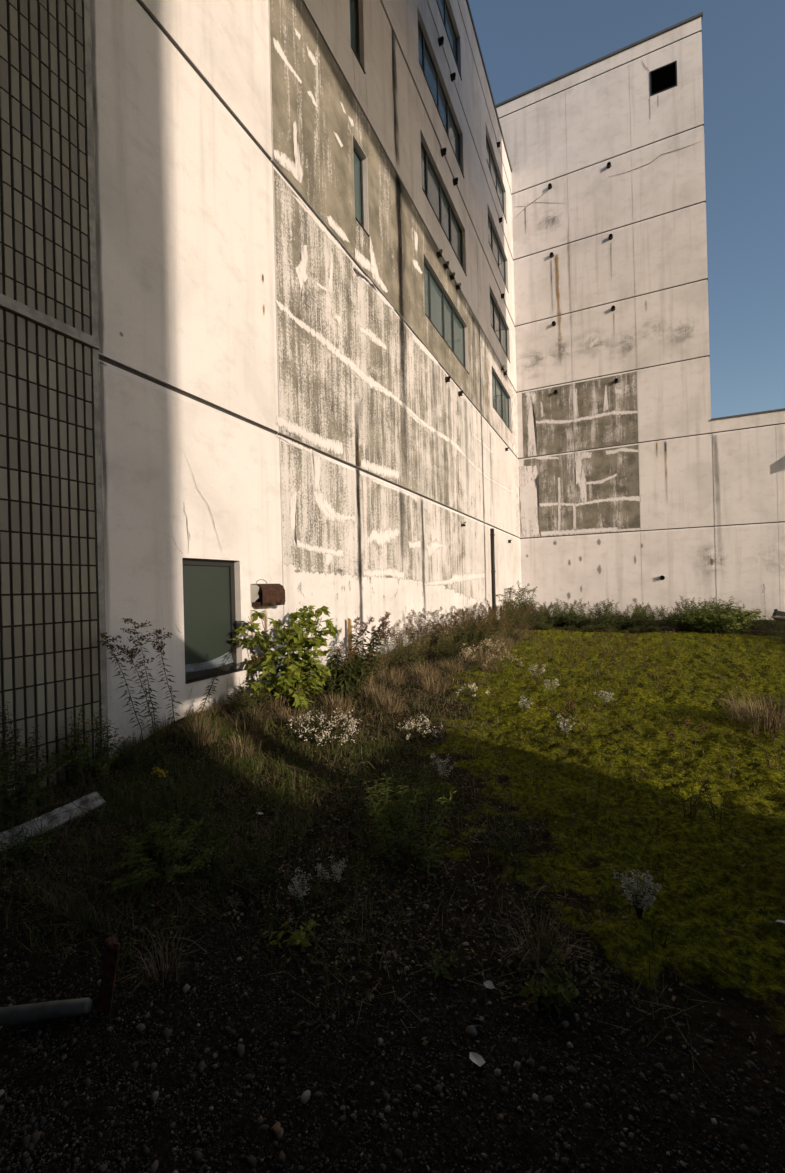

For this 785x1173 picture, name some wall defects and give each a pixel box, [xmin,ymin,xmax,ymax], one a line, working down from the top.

leakage [396,176,404,373]
crack [184,456,222,551]
leakage [355,433,363,626]